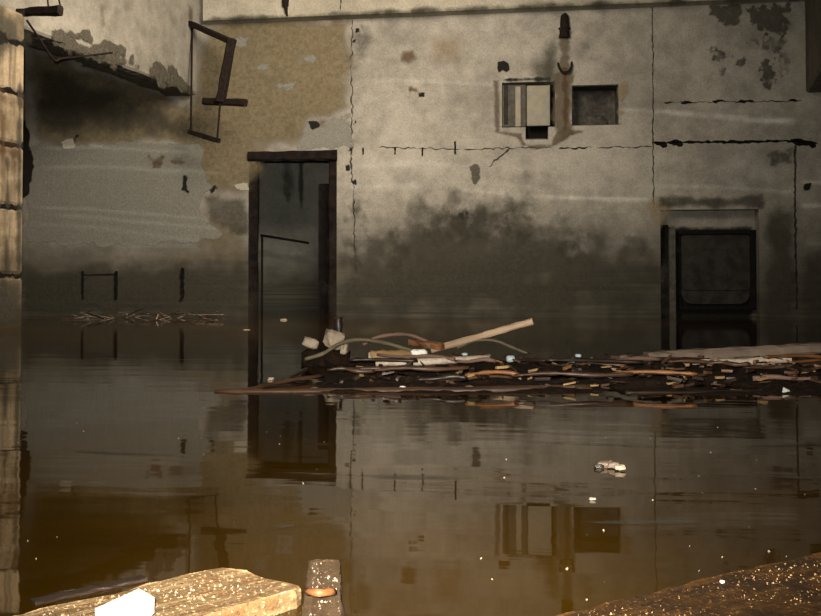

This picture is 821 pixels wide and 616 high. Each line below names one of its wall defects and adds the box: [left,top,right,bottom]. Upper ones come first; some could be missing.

peeling [709,2,791,52]
peeling [759,59,775,90]
peeling [22,21,364,248]
crack [379,7,817,310]
leakage [342,205,639,315]